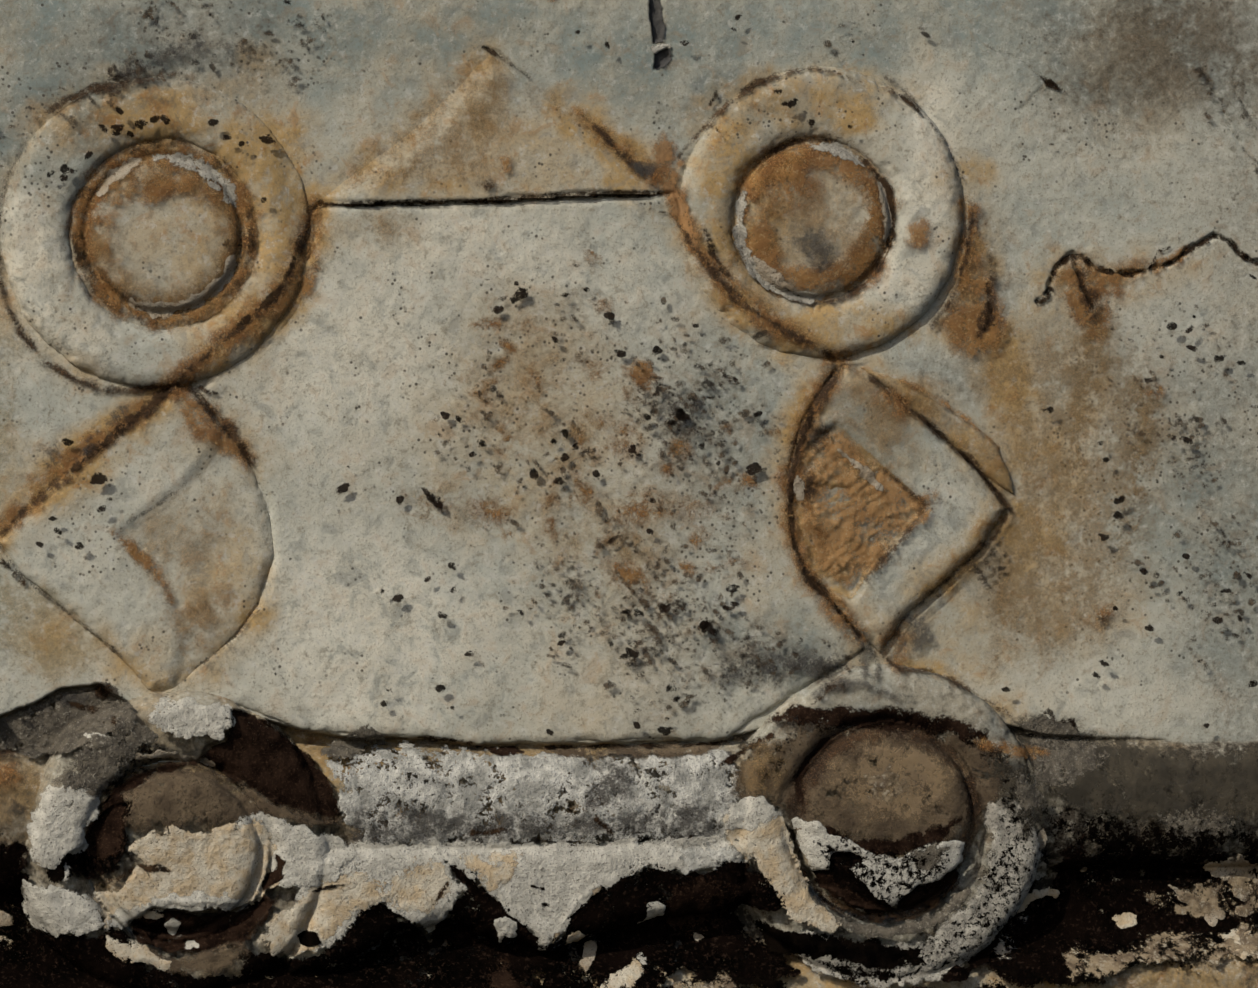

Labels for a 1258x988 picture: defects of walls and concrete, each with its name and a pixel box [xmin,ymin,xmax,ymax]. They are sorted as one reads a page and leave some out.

crack [303,190,676,241]
corrosion [481,156,511,190]
corrosion [1058,246,1190,342]
crack [1035,232,1258,308]
corrosion [575,109,1013,679]
damp [503,293,1034,865]
damp [0,841,808,988]
spalling [0,682,1258,988]
damp [977,798,1258,988]